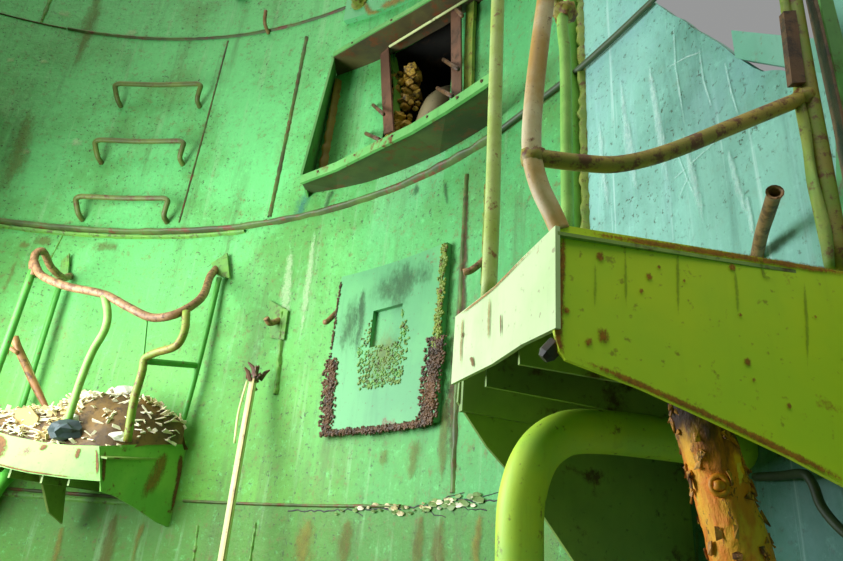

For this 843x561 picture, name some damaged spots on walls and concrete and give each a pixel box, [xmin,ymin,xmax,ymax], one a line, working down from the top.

rust [601,234,843,274]
rust [554,239,570,350]
rust [586,329,609,346]
rust [593,364,841,479]
rust [0,436,69,477]
rust [95,450,106,481]
rust [145,454,167,494]
rust [171,456,183,510]